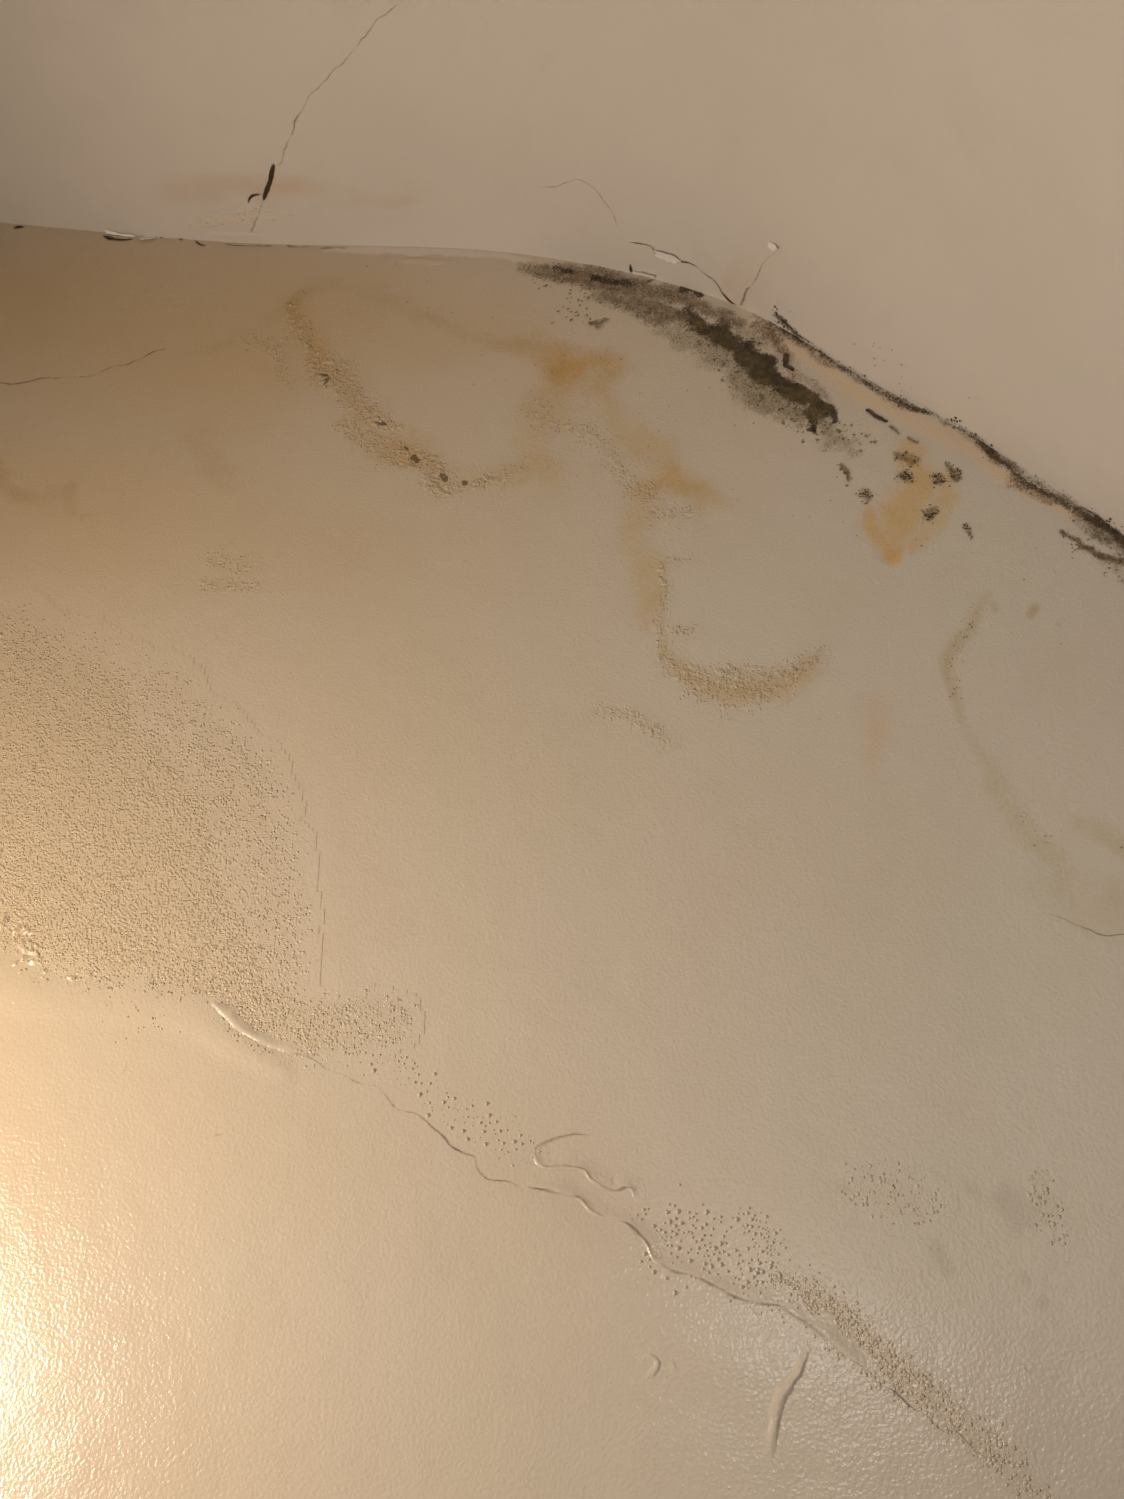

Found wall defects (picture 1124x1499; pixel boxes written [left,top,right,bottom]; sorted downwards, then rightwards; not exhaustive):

crack [248,164,275,203]
crack [629,242,760,304]
leakage [526,263,1124,582]
crack [208,998,298,1052]
crack [486,1136,911,1407]